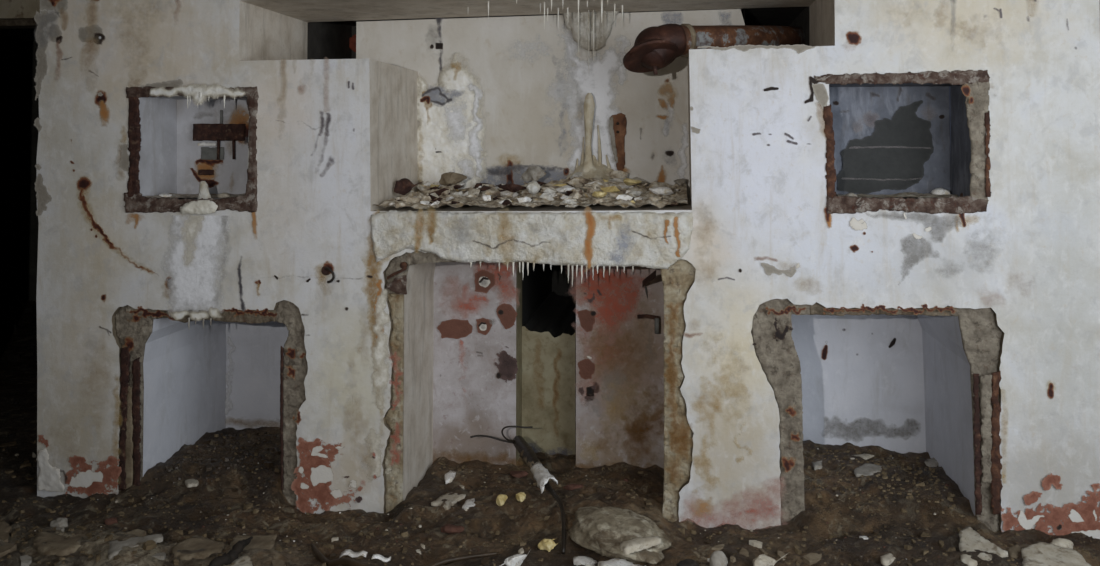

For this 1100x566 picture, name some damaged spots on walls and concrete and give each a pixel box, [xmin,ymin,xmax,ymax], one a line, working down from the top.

water stain [417,18,630,190]
rust [846,32,862,45]
peeling [837,87,945,194]
rust [70,161,153,272]
water stain [164,215,228,329]
spalling [60,300,363,514]
spalling [384,251,527,513]
rust [584,210,596,268]
peeling [575,266,644,400]
spalling [660,257,1100,539]